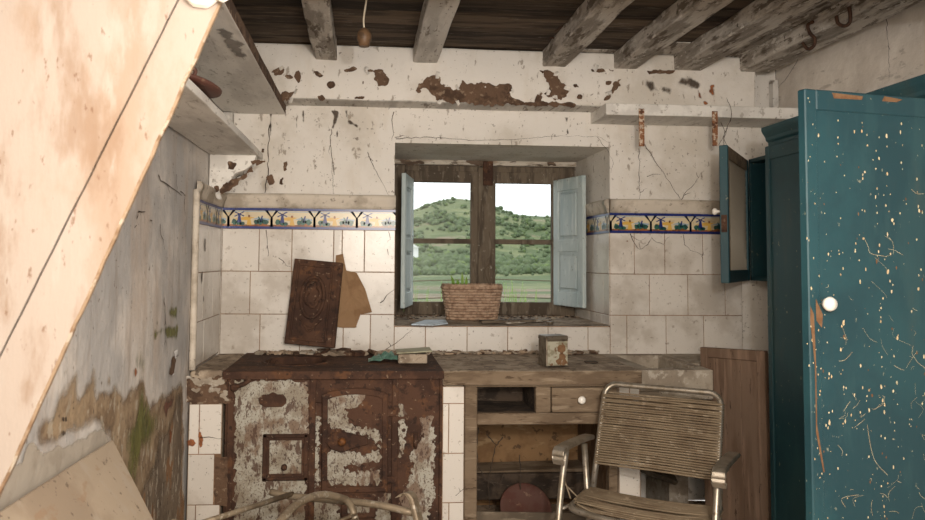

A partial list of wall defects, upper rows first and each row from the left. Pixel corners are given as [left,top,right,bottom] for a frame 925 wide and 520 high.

peeling [269,66,301,103]
peeling [314,71,335,101]
peeling [344,66,389,86]
peeling [416,70,582,108]
peeling [591,64,621,101]
crack [638,145,699,200]
water stain [39,376,185,520]